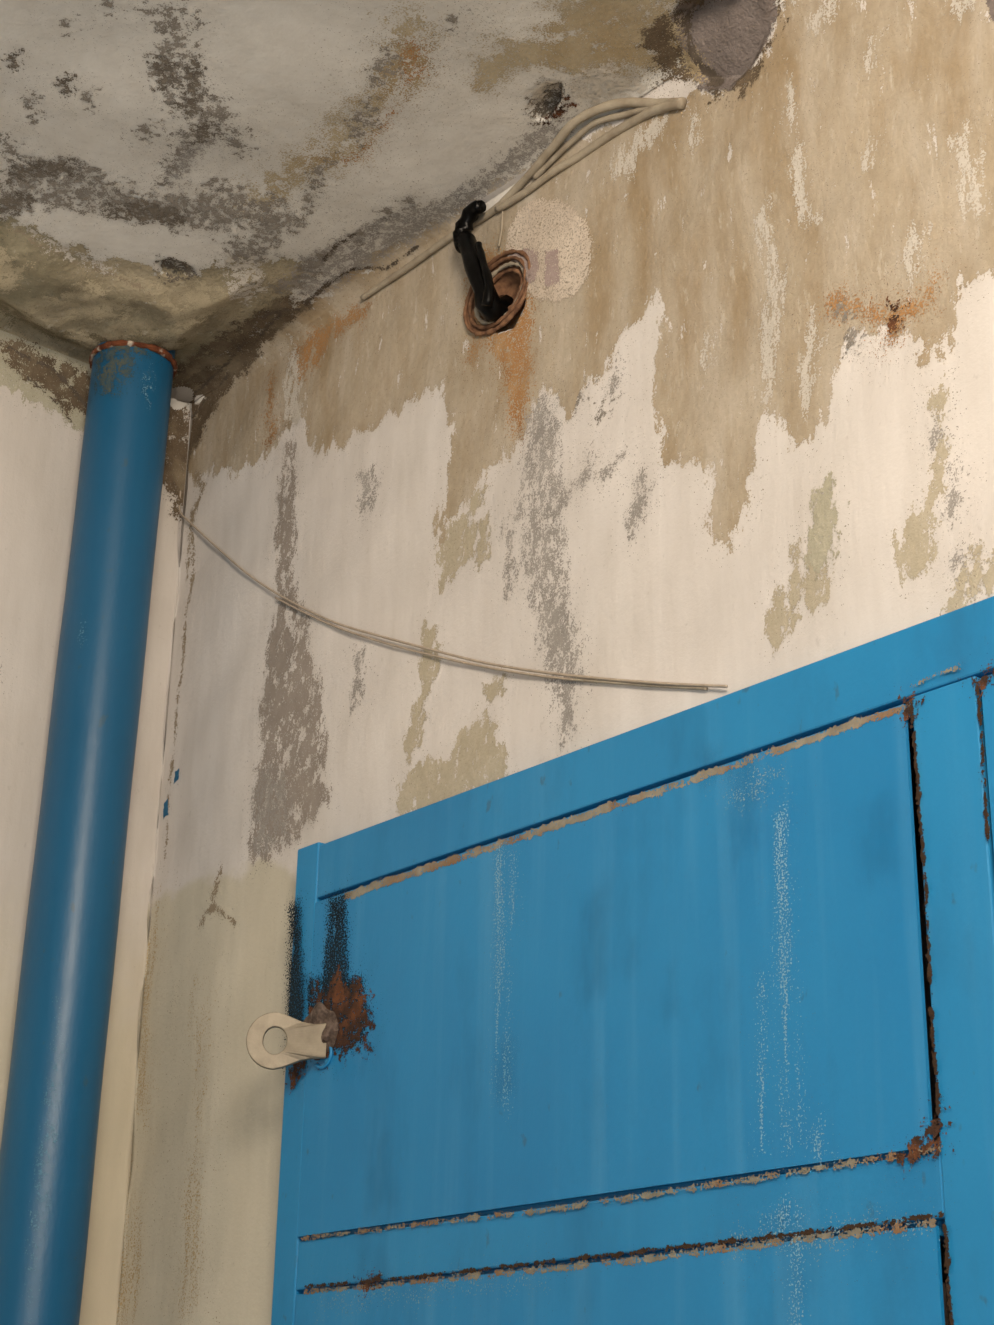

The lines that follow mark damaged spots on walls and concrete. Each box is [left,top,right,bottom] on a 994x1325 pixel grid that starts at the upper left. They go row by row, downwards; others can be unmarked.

leakage [0,0,695,300]
corrosion [479,229,522,263]
corrosion [455,257,550,453]
peeling [188,0,994,613]
corrosion [806,248,961,367]
peeling [763,471,850,657]
peeling [395,617,513,816]